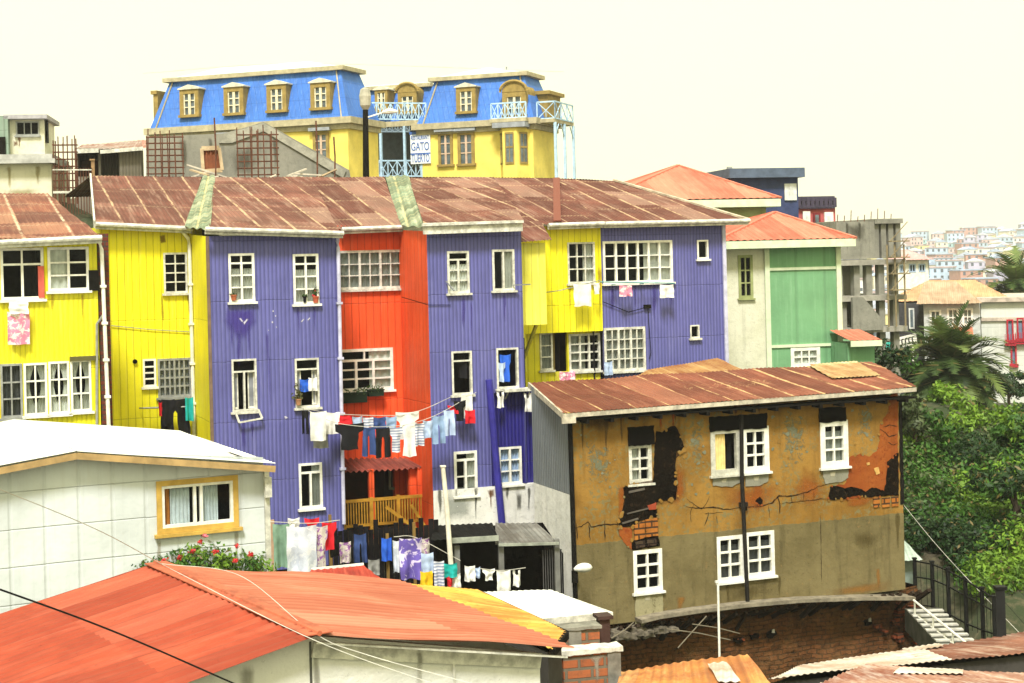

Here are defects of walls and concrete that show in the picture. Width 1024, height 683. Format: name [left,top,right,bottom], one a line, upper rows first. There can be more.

spalling [574,419,709,550]
crack [683,484,827,533]
peeling [827,393,899,508]